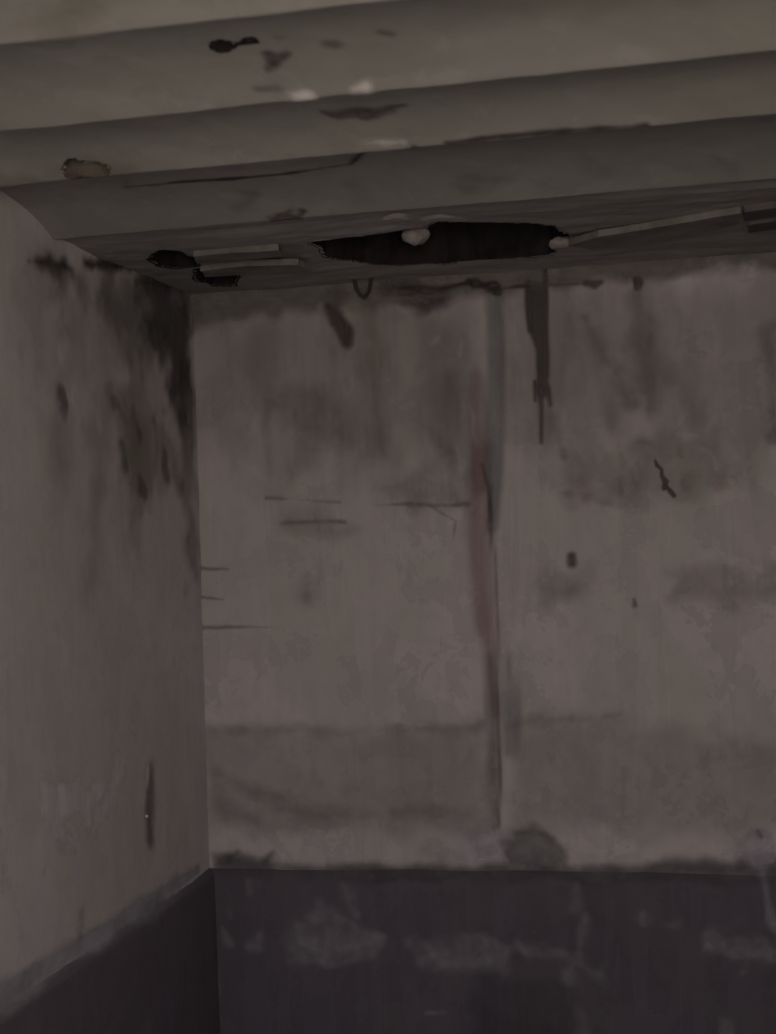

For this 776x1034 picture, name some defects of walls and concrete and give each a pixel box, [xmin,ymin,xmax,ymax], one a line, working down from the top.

spalling [308,213,574,266]
leakage [141,252,776,443]